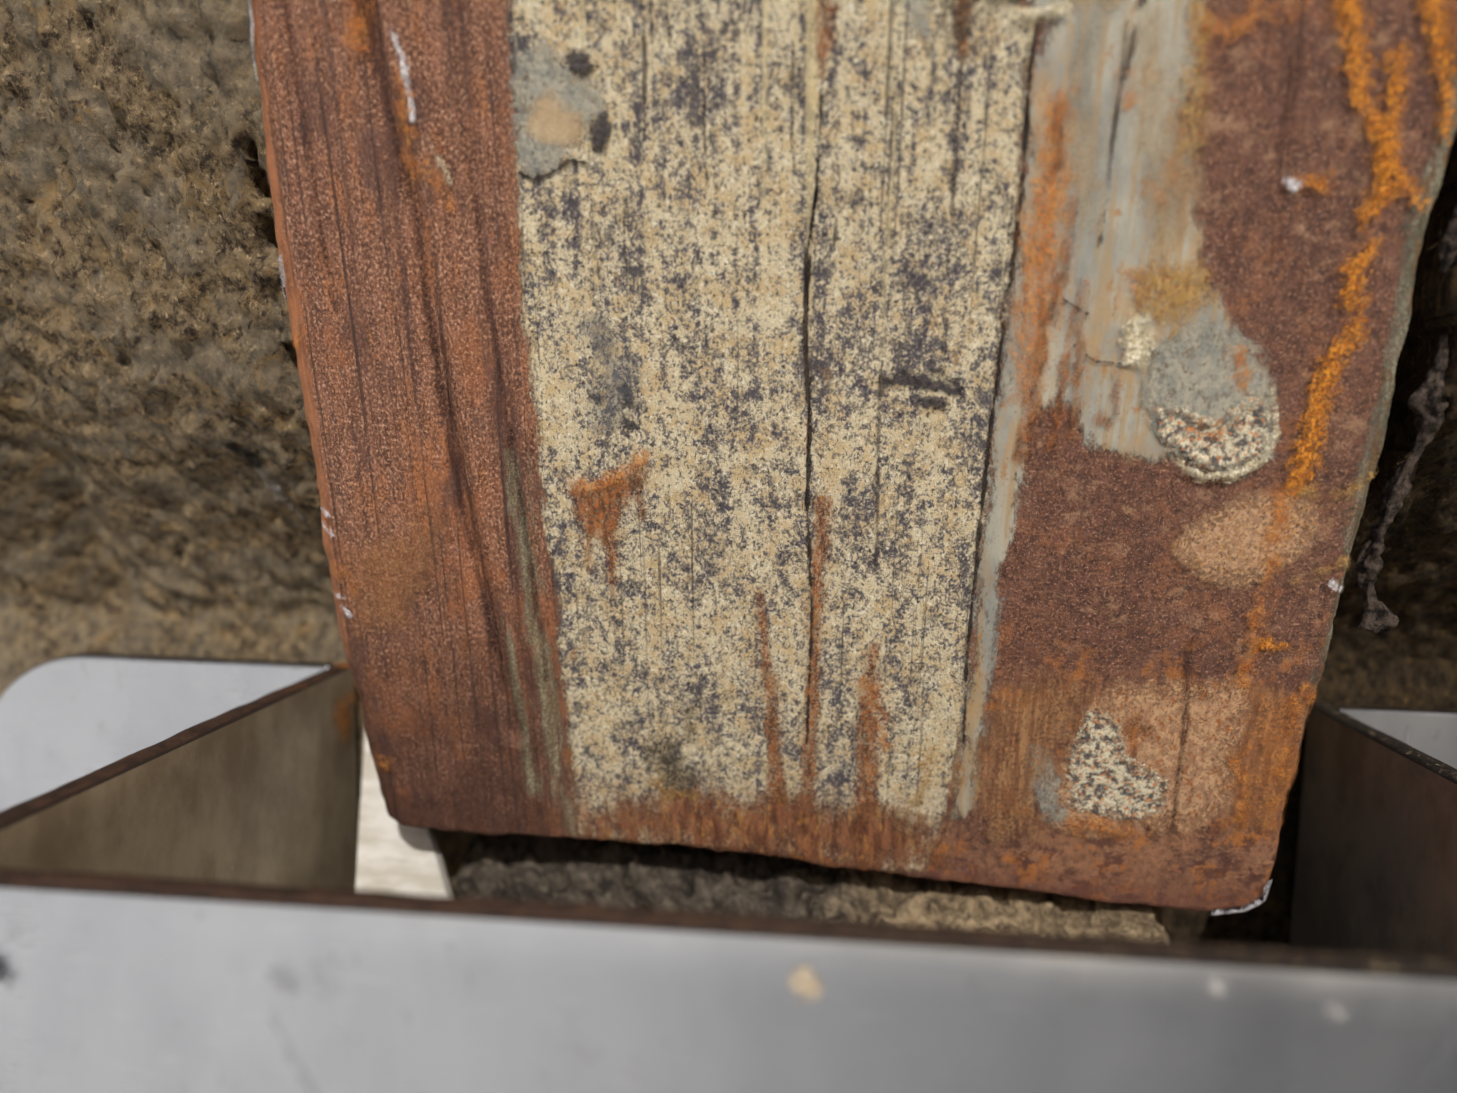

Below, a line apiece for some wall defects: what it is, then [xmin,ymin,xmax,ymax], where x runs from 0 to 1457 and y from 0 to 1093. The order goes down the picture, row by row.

peeling [510,39,612,182]
rust [570,450,649,597]
crack [790,42,838,745]
crack [875,360,884,569]
peeling [1119,312,1282,483]
rust [1225,0,1457,830]
rust [575,496,948,873]
peeling [1064,710,1171,837]